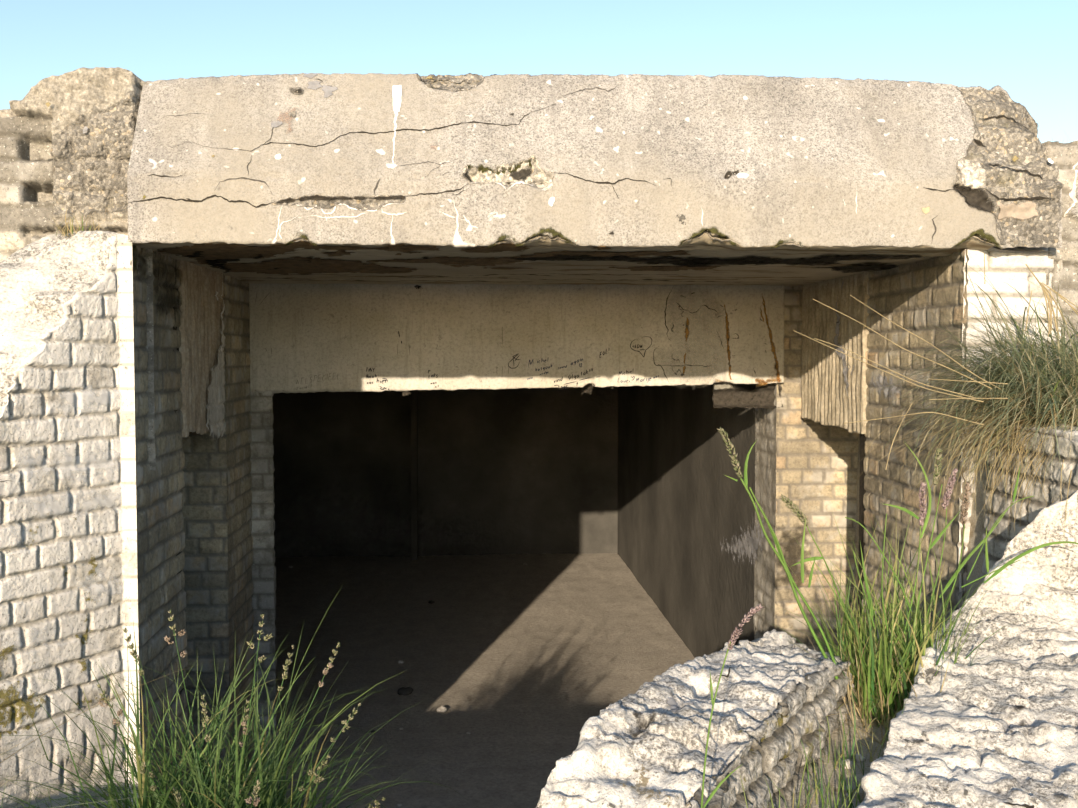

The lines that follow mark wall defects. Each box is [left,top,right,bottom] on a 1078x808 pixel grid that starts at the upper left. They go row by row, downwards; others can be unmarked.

spalling [416,73,497,92]
spalling [50,91,140,216]
crack [126,82,625,208]
spalling [461,156,554,191]
crack [559,173,672,200]
spalling [953,86,1078,249]
damp [272,208,365,244]
damp [439,201,477,248]
corrosion [724,305,732,380]
corrosion [756,296,780,385]